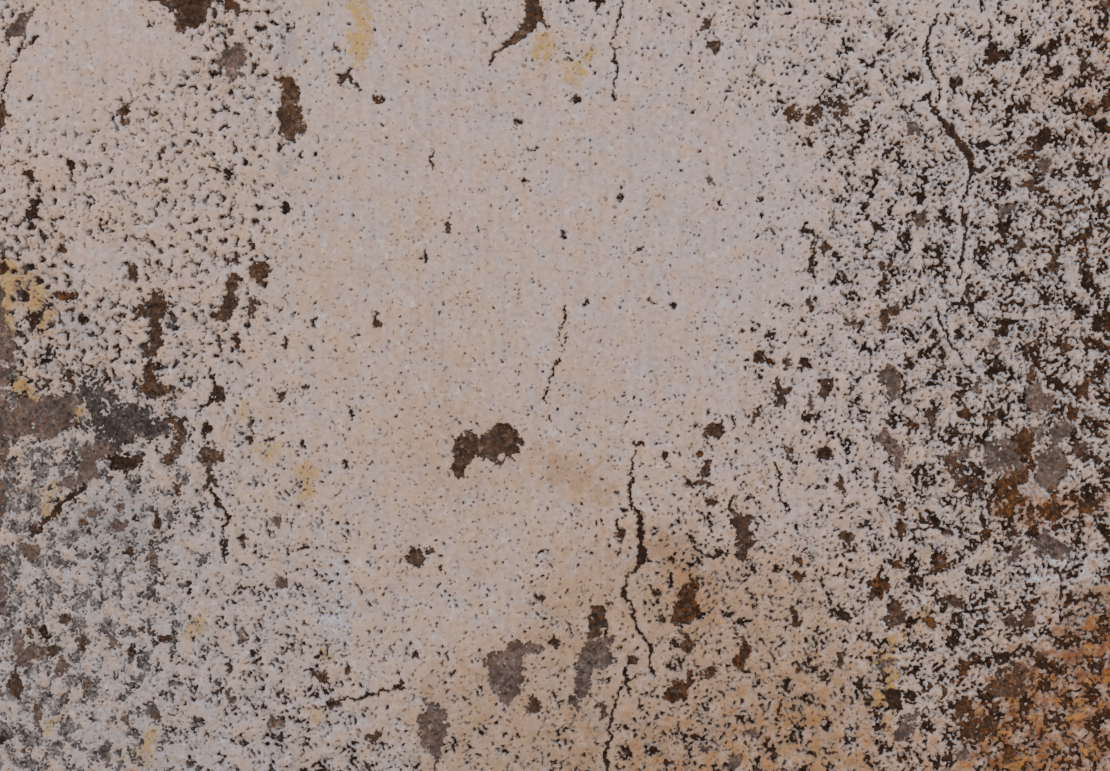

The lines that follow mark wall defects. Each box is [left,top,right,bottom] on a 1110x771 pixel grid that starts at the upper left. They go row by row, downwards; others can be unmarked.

flaking render [148,0,248,34]
crack [488,0,551,66]
crack [974,0,992,45]
crack [917,13,987,286]
crack [935,306,977,374]
flaking render [450,423,525,480]
crack [603,450,674,771]
spalling [6,613,72,727]
flaking render [483,634,561,715]
flaking render [564,599,639,719]
rust [961,600,1110,771]
flaking render [416,698,451,771]